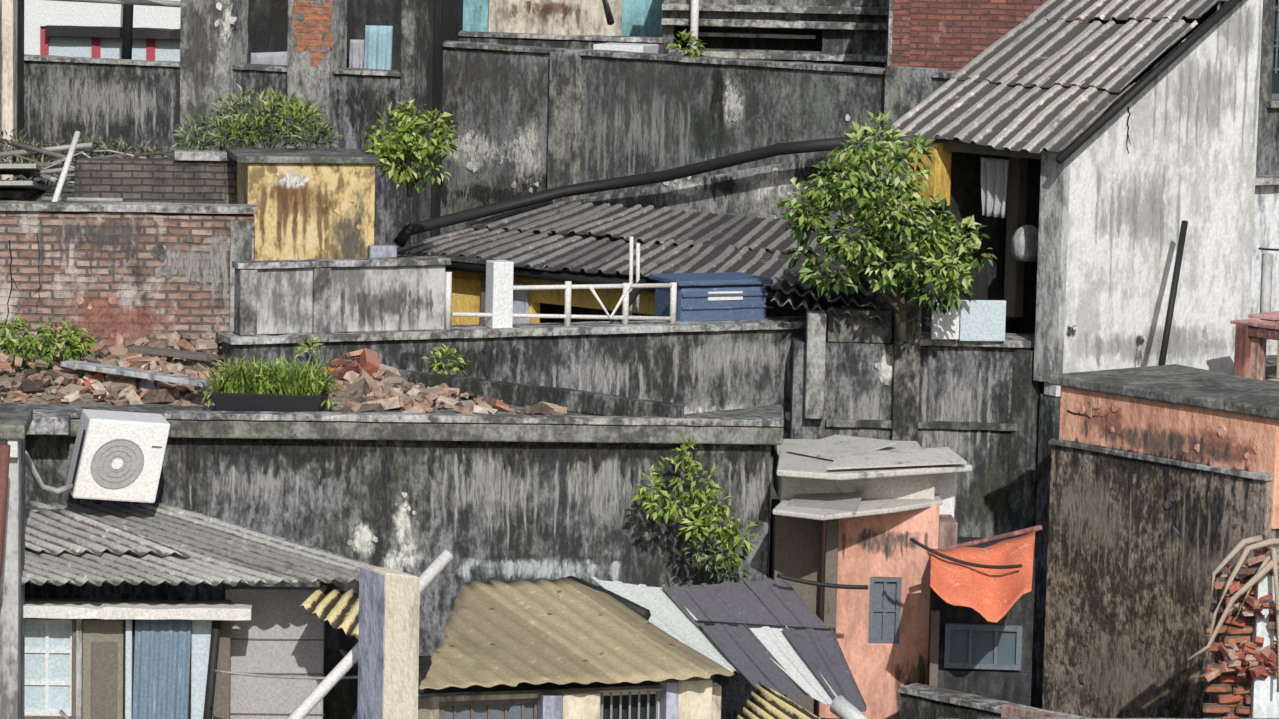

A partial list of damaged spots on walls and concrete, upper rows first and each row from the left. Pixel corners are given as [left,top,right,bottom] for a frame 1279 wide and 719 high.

spalling [292,0,333,66]
water stain [585,64,690,179]
water stain [705,69,723,138]
water stain [187,438,403,506]
water stain [428,441,705,544]
water stain [1055,420,1253,608]
water stain [459,558,620,581]